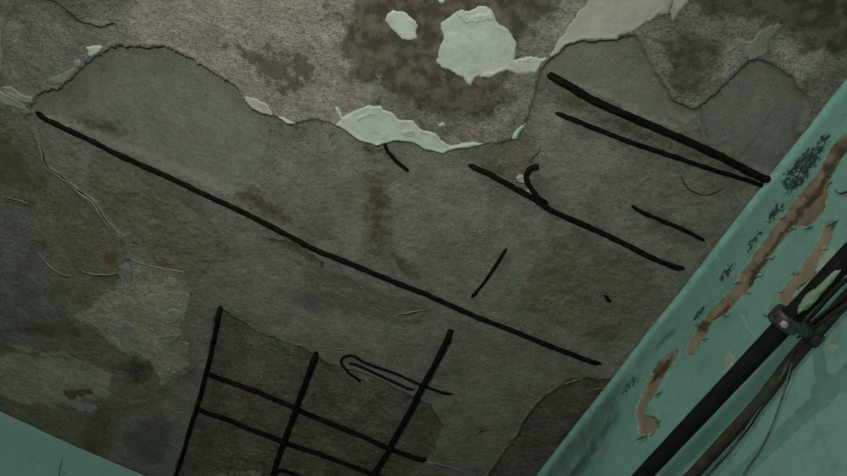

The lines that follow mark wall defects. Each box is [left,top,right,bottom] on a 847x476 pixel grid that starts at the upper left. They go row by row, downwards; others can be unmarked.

damp [222,36,315,95]
damp [323,0,559,124]
rust [547,72,771,188]
spalling [539,35,812,176]
rust [35,111,602,365]
spalling [27,45,763,476]
rust [468,164,685,270]
rust [631,205,705,242]
peeling [636,134,847,440]
rust [173,305,454,476]